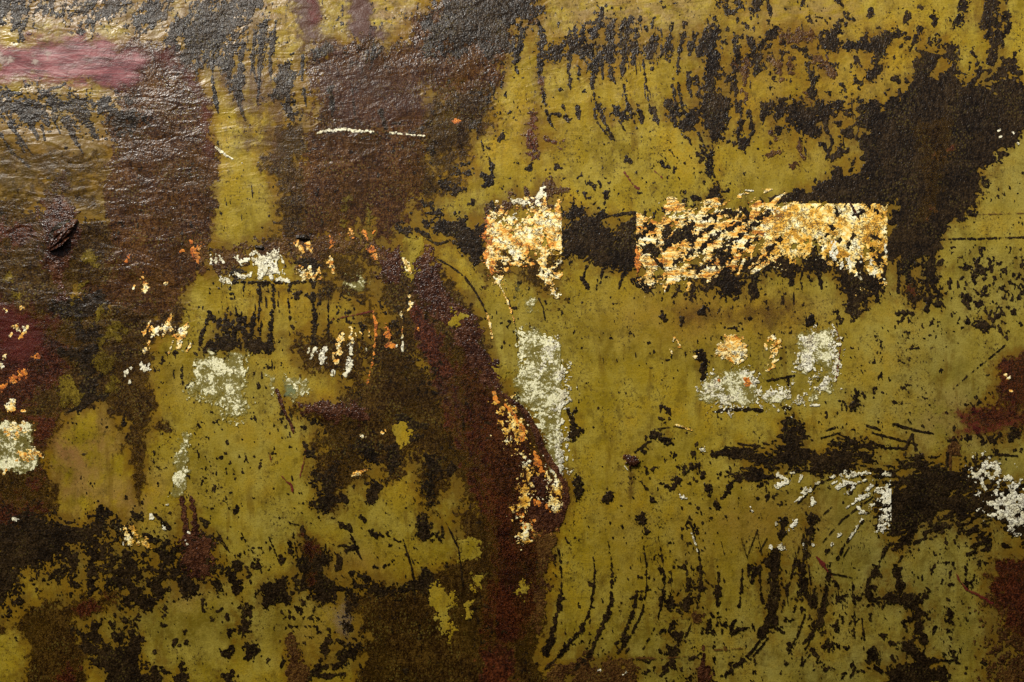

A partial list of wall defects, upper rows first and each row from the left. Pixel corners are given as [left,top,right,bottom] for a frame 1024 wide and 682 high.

corrosion [289,0,384,54]
corrosion [0,170,84,303]
corrosion [0,301,74,525]
corrosion [375,244,571,682]
peeling [436,376,584,554]
peeling [945,391,993,418]
corrosion [957,350,1024,442]